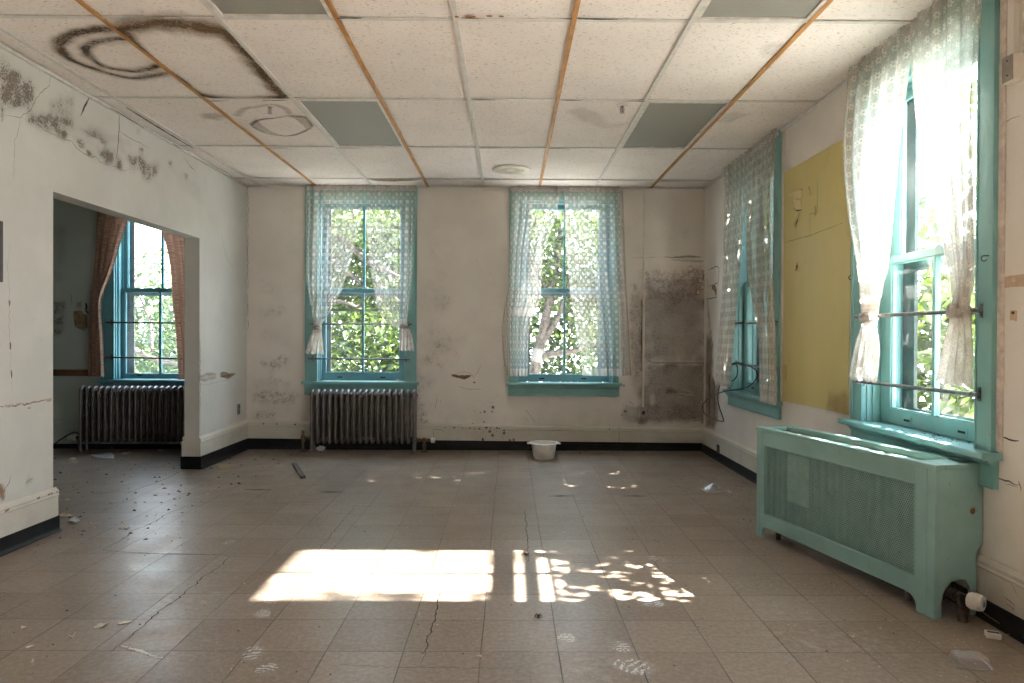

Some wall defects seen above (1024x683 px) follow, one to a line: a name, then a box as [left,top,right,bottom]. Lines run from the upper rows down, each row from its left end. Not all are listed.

damp [54,19,286,99]
damp [623,264,718,426]
crack [111,554,265,652]
crack [340,589,480,669]